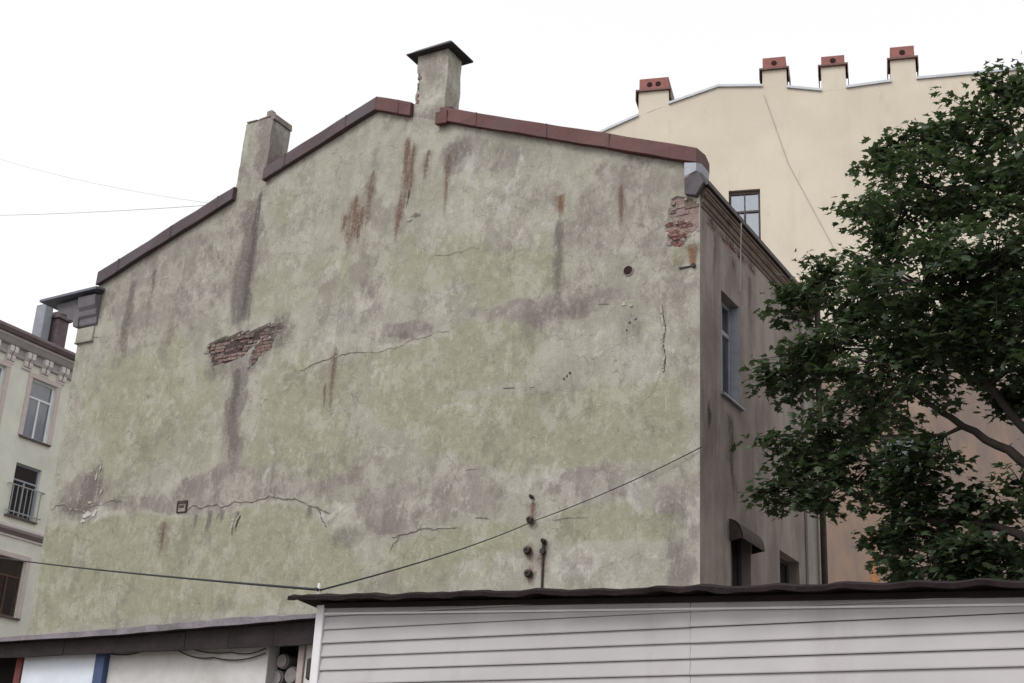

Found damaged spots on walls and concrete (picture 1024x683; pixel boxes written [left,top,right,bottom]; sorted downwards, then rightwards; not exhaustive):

leakage [233,194,262,321]
spalling [665,198,754,273]
spalling [204,317,289,375]
crack [299,326,457,371]
leakage [225,370,240,459]
crack [187,494,330,528]
crack [390,517,488,550]